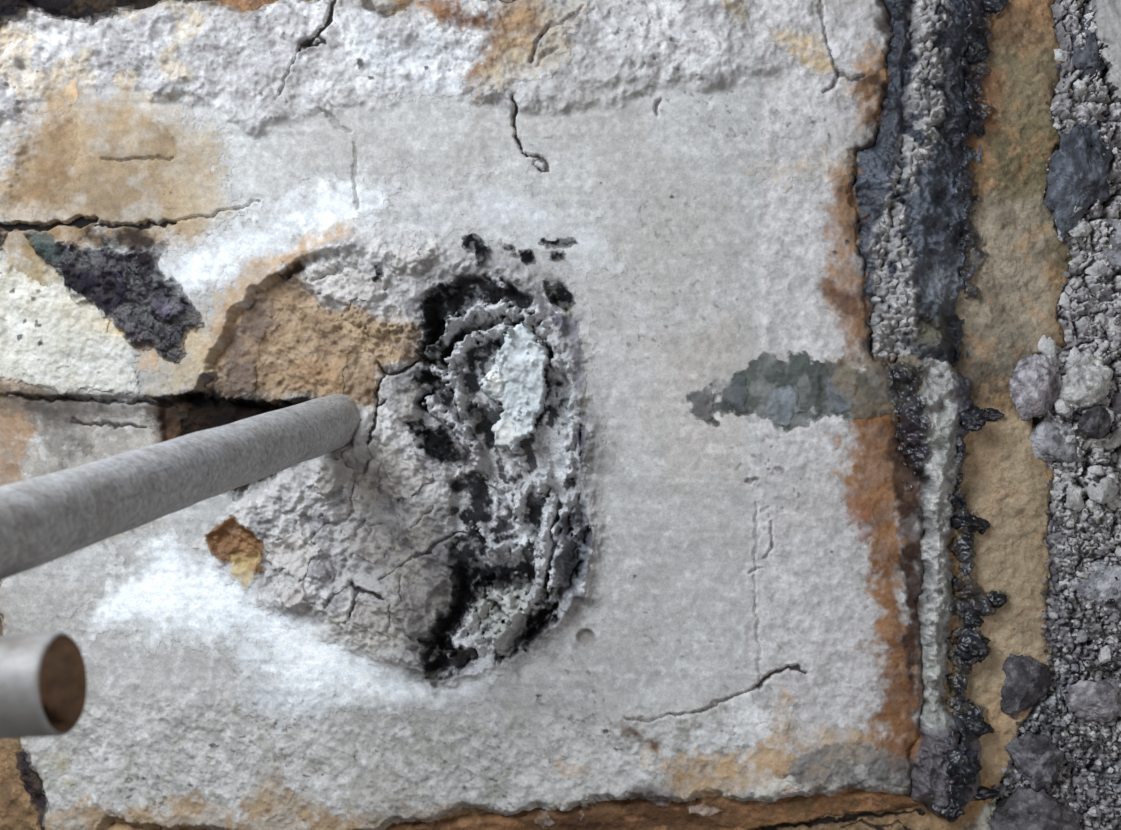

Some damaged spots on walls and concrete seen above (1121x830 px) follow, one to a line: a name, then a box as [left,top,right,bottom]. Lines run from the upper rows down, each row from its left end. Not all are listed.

crack [275,0,337,100]
crack [511,95,550,173]
crack [0,200,257,232]
rust [135,214,362,397]
spalling [185,221,624,698]
rust [617,413,935,816]
rust [43,748,470,830]
crack [751,808,926,830]
rust [862,793,991,830]